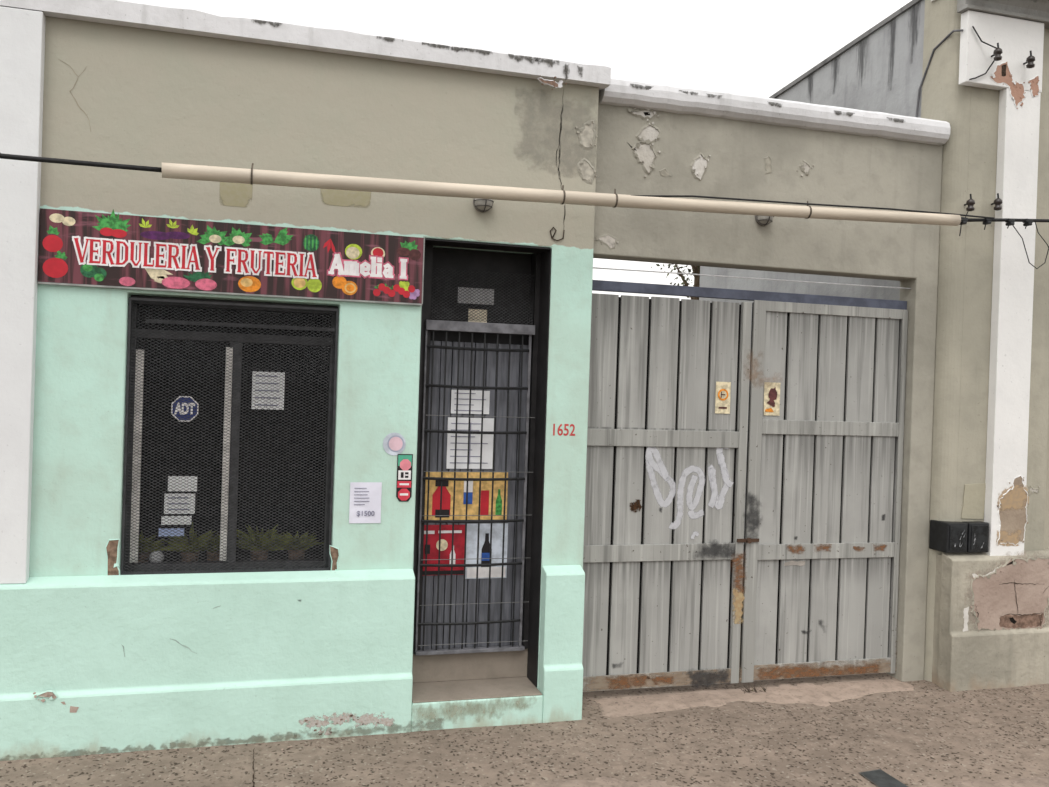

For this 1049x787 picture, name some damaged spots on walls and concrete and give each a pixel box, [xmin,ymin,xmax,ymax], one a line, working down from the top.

peeling [989,61,1040,109]
peeling [628,108,661,177]
peeling [690,152,711,181]
spalling [963,475,1049,632]
corrosion [732,554,745,624]
corrosion [607,676,673,689]
corrosion [758,664,879,679]
spalling [33,690,79,713]
peeling [299,712,394,735]